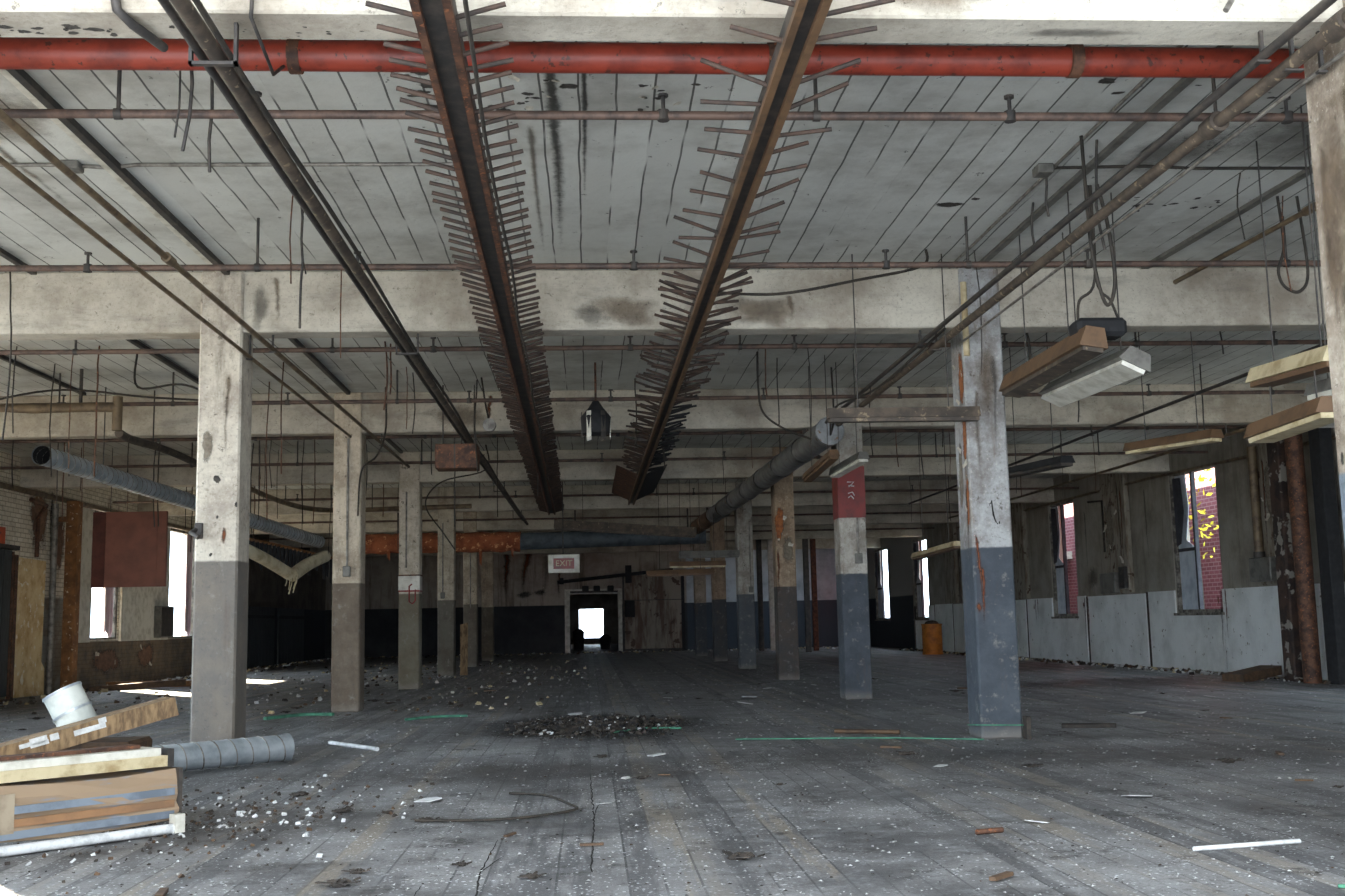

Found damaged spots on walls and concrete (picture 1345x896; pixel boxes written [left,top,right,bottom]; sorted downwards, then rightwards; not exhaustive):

water stain [529,130,539,213]
water stain [545,73,562,221]
water stain [604,301,646,320]